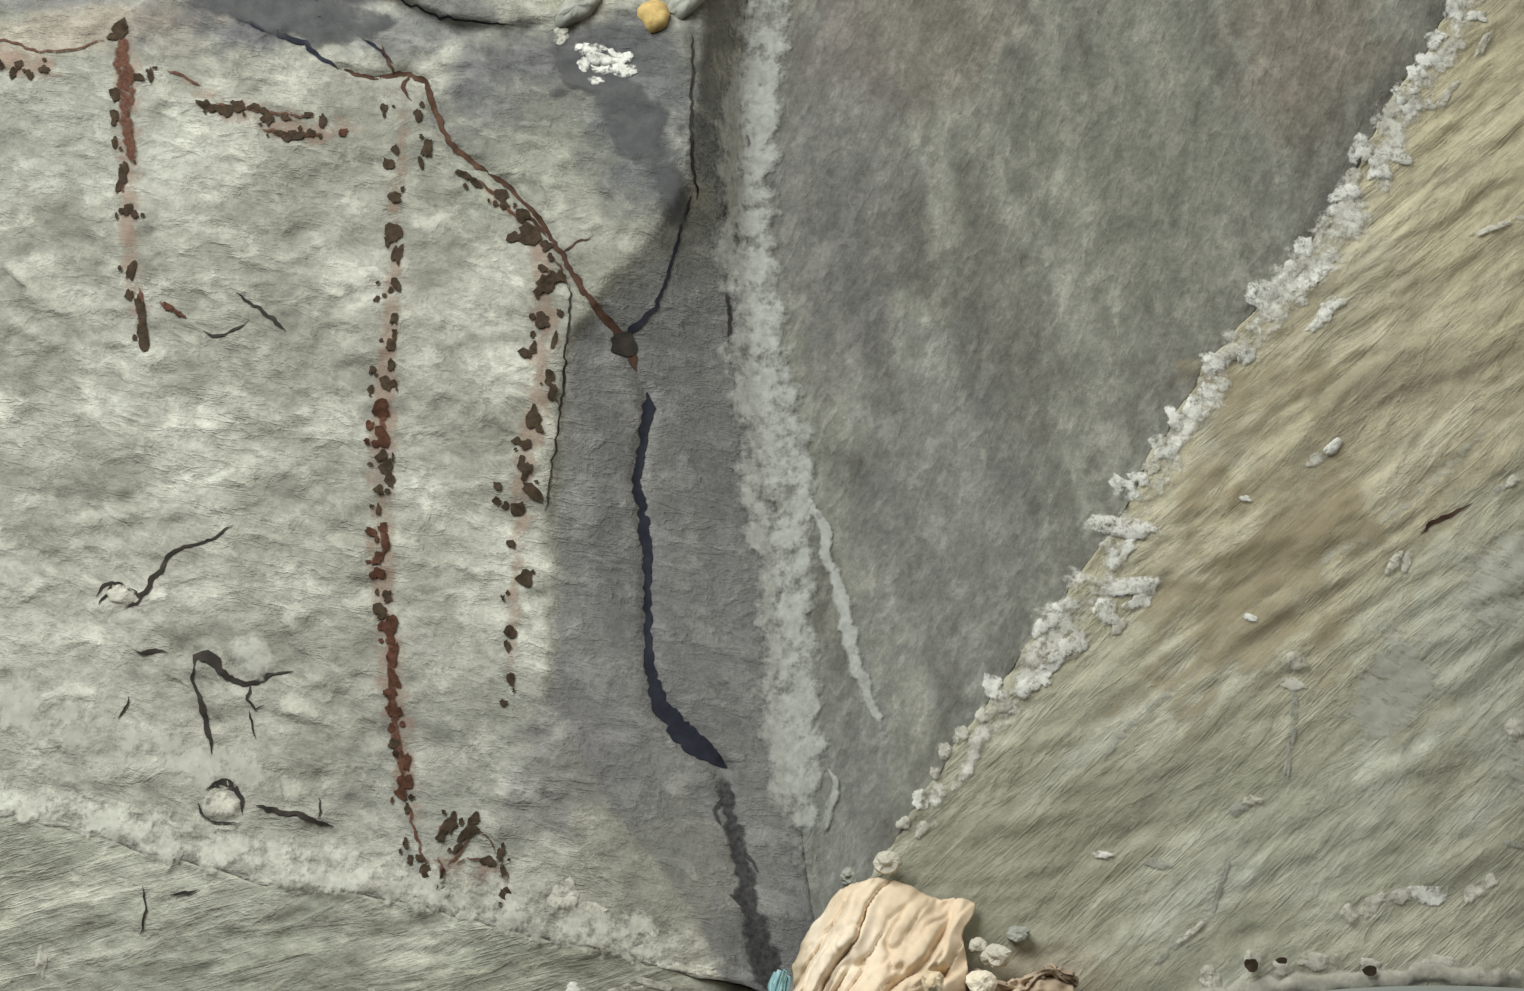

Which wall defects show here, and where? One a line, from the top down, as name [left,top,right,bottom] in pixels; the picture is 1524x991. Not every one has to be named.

rust [0,17,348,219]
rust [413,101,432,169]
rust [118,260,186,351]
crack [203,292,286,337]
rust [455,169,569,358]
crack [96,526,232,608]
rust [363,222,511,907]
crack [228,0,781,989]
rust [500,569,535,602]
rust [492,369,558,515]
crack [134,648,333,827]
crack [139,886,199,936]